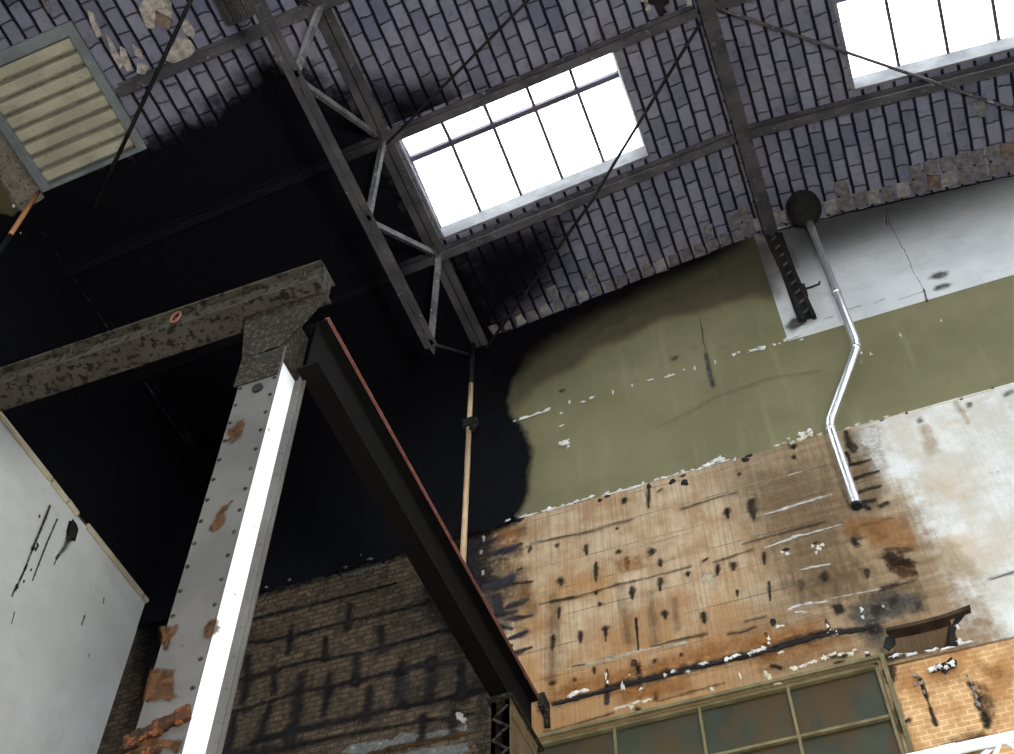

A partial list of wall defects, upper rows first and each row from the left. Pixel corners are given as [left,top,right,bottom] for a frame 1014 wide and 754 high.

spalling [139,0,196,68]
crack [761,175,1014,302]
rust [226,421,245,442]
peeling [505,453,753,522]
rust [209,501,231,531]
leakage [798,563,831,590]
leakage [788,588,880,613]
rust [204,619,221,638]
rust [145,669,176,701]
spalling [551,607,876,710]
spalling [883,615,973,726]
spalling [966,673,994,728]